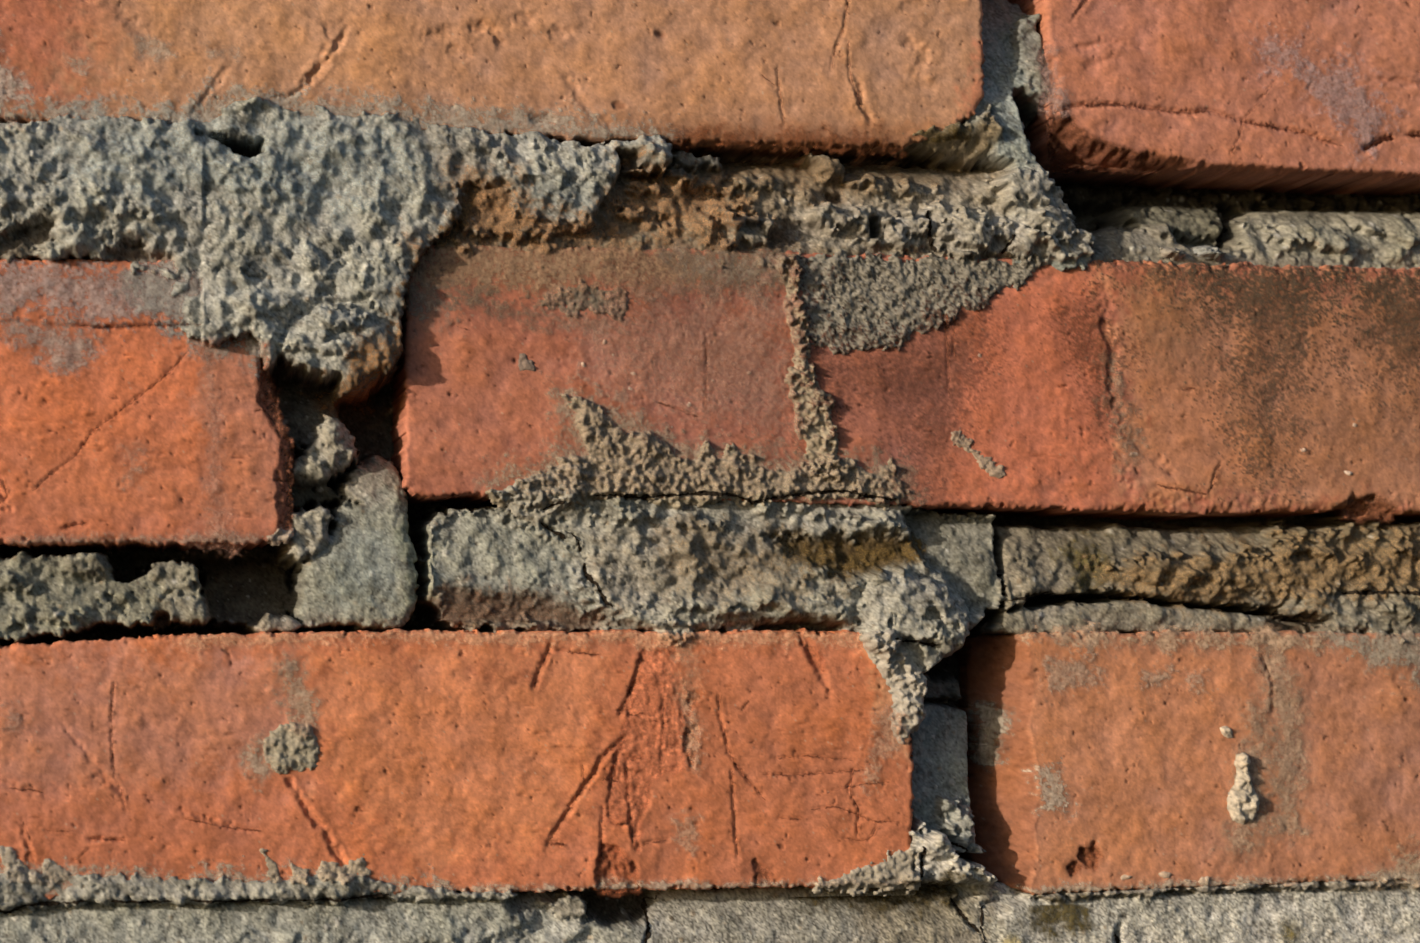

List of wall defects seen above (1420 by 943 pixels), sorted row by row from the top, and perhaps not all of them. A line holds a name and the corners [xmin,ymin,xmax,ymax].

crack [1054,81,1420,152]
crack [925,210,937,252]
crack [1001,234,1016,254]
crack [641,895,657,943]